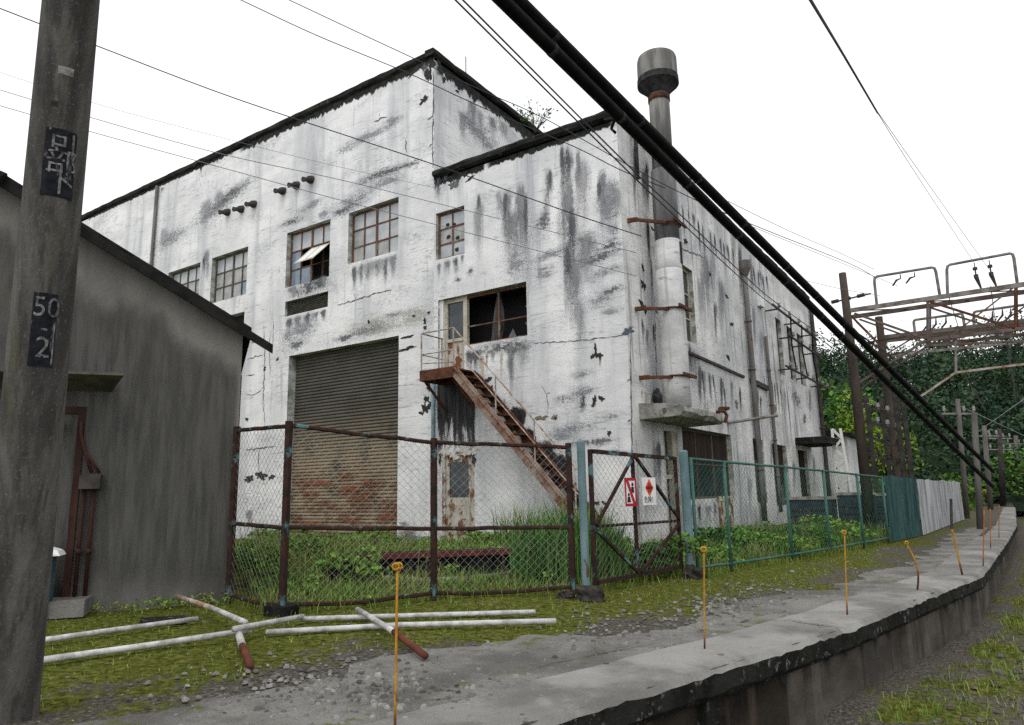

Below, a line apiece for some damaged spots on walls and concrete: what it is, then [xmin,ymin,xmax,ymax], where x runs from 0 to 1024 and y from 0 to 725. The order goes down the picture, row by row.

water stain [90,61,624,328]
crack [246,323,276,468]
water stain [689,347,741,412]